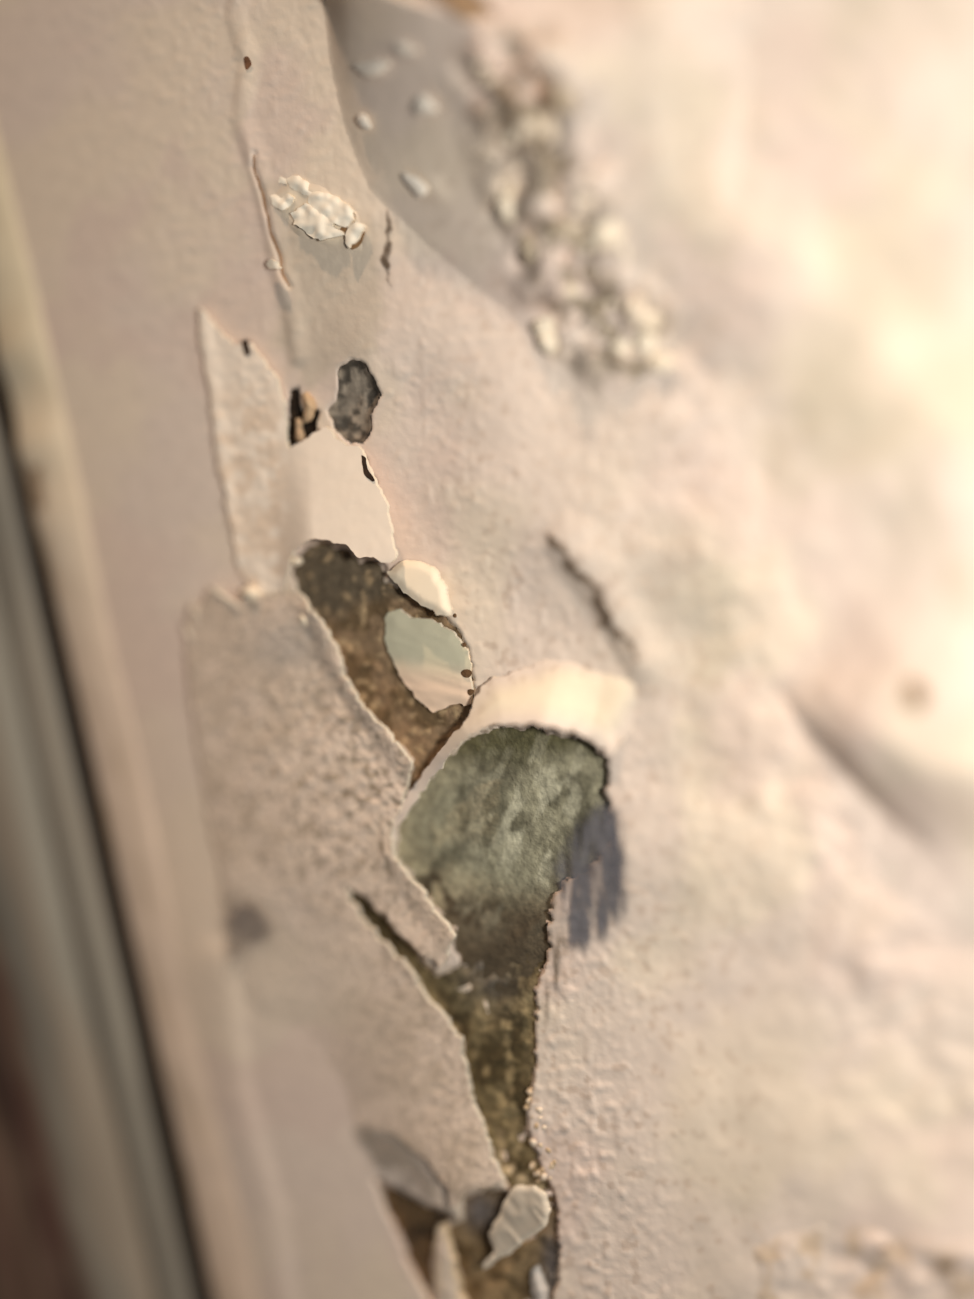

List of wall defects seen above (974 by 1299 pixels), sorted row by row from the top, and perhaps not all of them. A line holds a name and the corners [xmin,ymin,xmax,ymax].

crack [243,56,251,70]
crack [253,154,290,287]
peeling [184,308,559,1299]